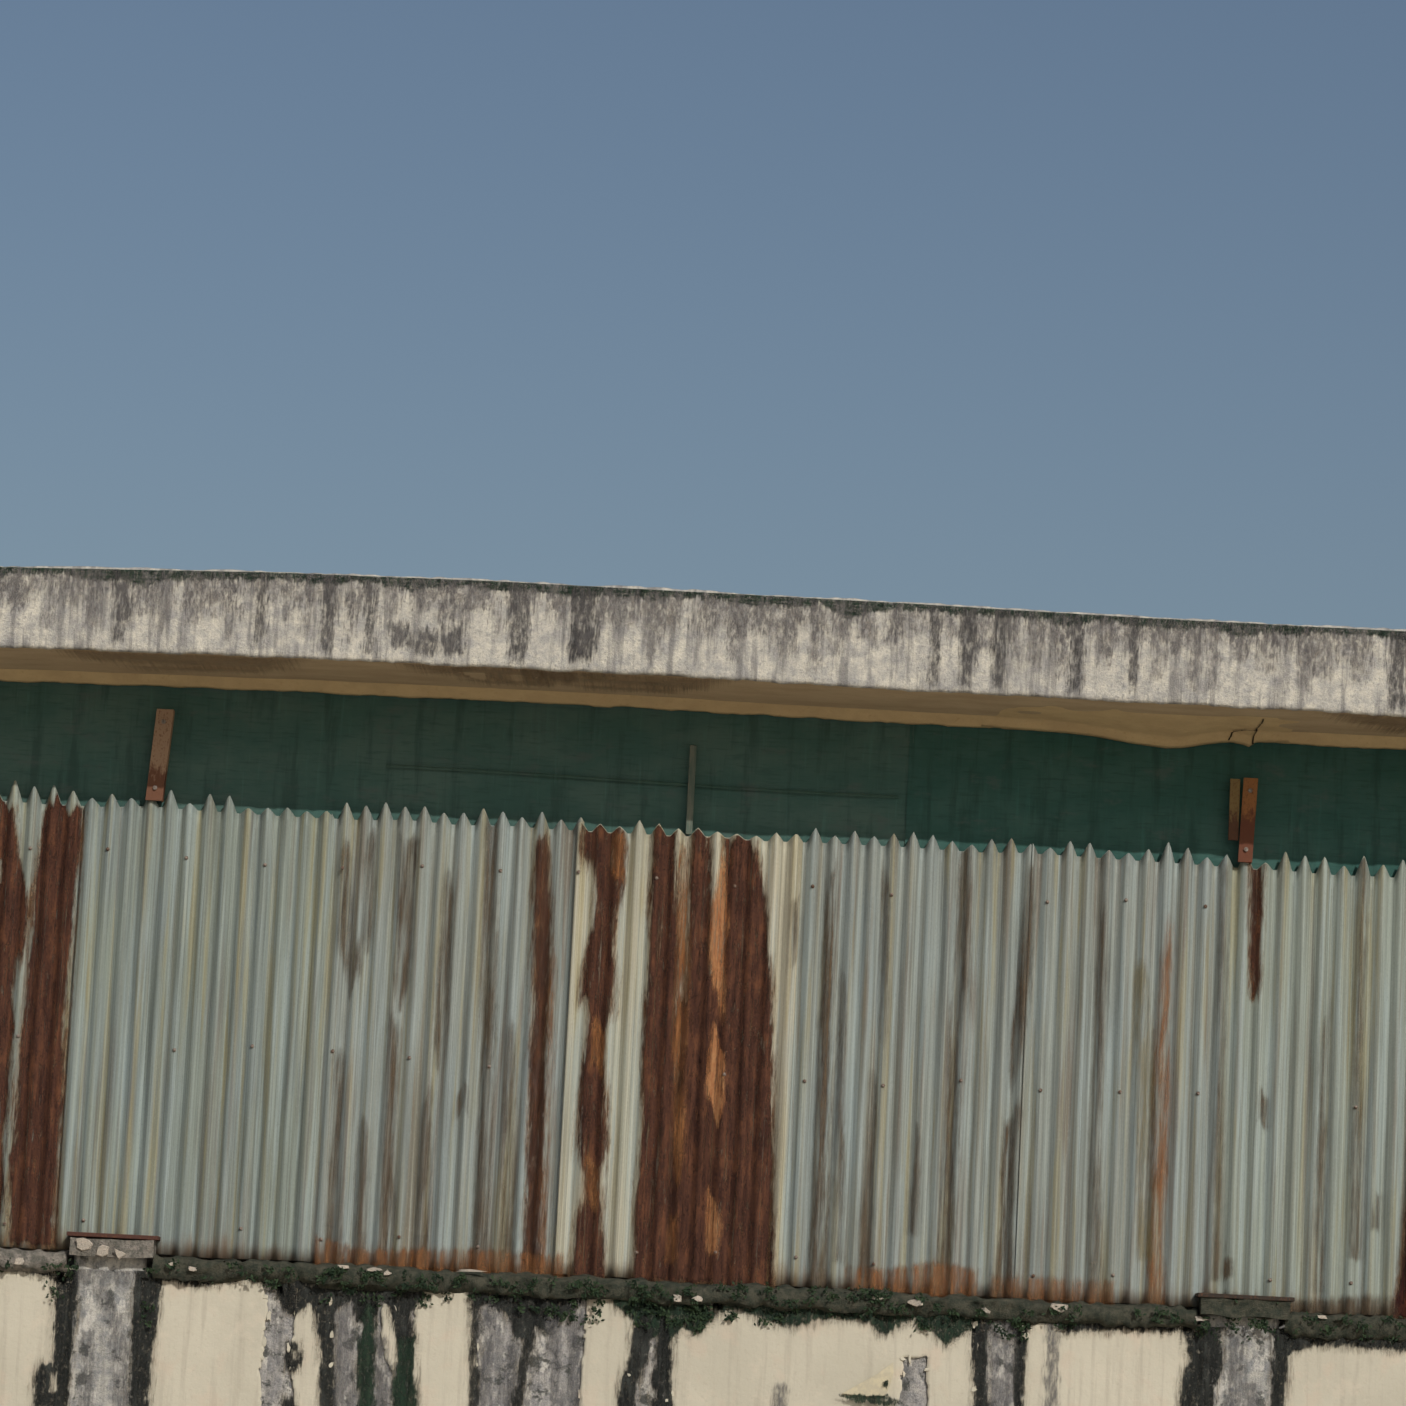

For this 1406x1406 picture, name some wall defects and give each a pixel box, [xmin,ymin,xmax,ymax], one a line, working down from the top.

damp [0,567,1406,709]
corrosion [0,794,84,1248]
corrosion [315,824,628,1278]
corrosion [632,825,776,1287]
corrosion [1293,1096,1406,1319]
damp [27,1268,425,1406]
damp [467,1292,584,1406]
damp [613,1299,1029,1406]
damp [1044,1323,1406,1406]